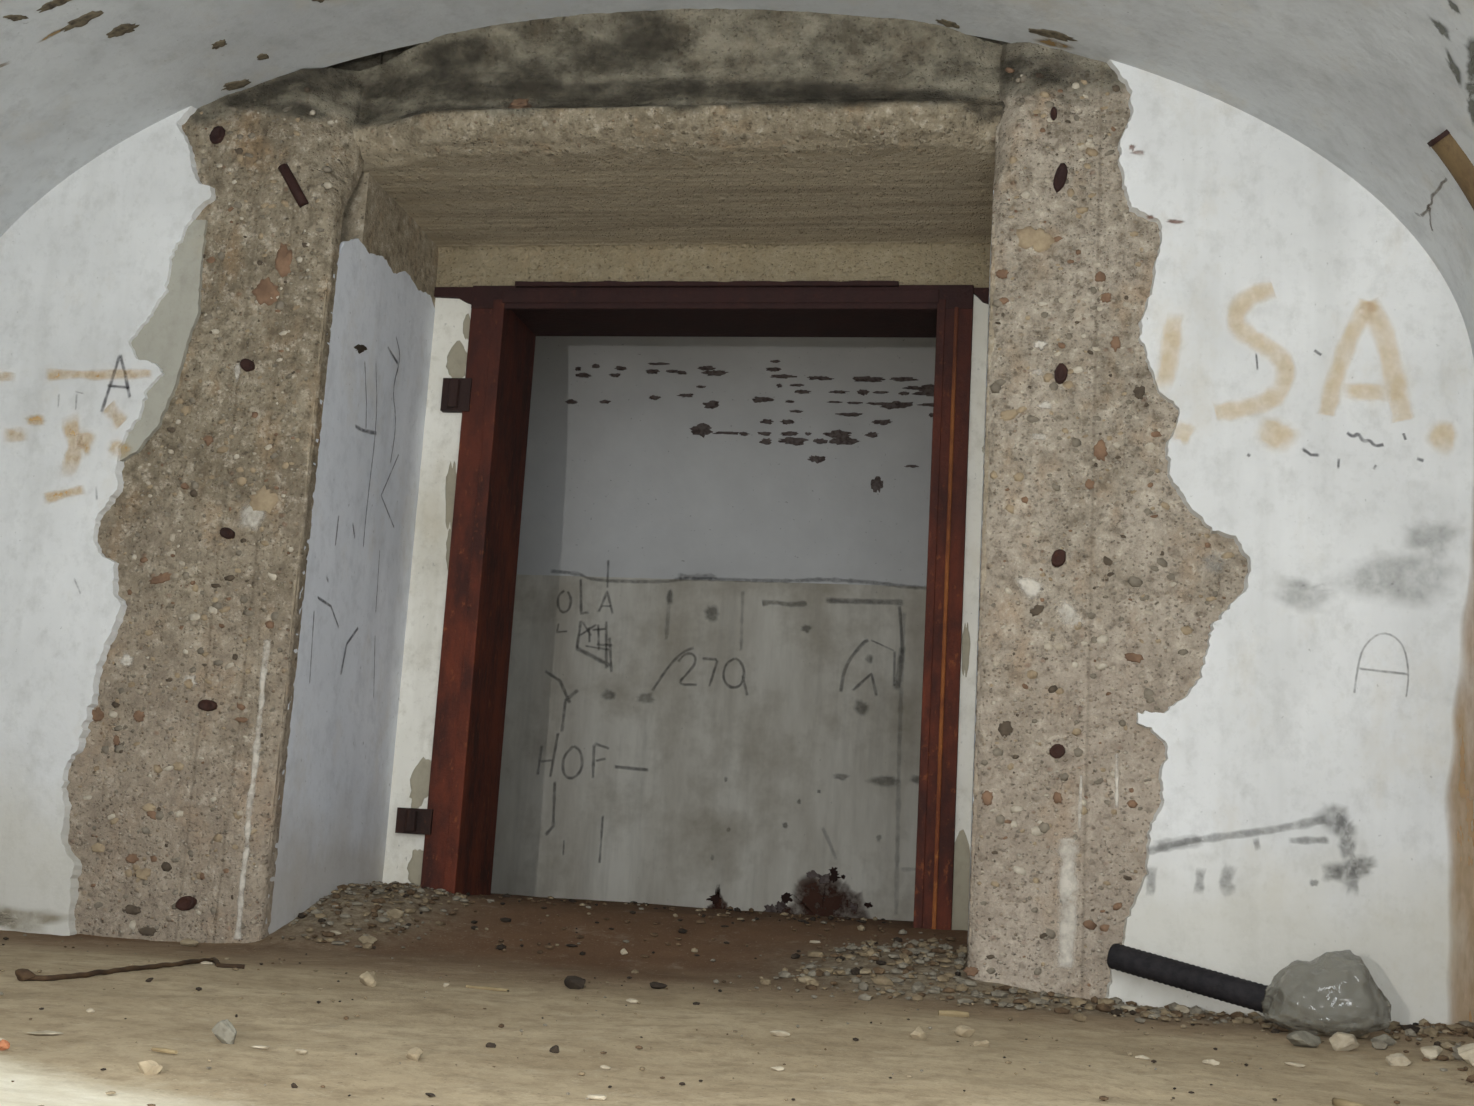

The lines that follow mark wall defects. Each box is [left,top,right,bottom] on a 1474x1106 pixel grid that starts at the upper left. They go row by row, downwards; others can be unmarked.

water stain [224,18,950,122]
water stain [970,101,1005,120]
water stain [1000,57,1060,84]
water stain [1432,20,1474,123]
spalling [67,8,1248,1000]
rust [1453,700,1474,1026]